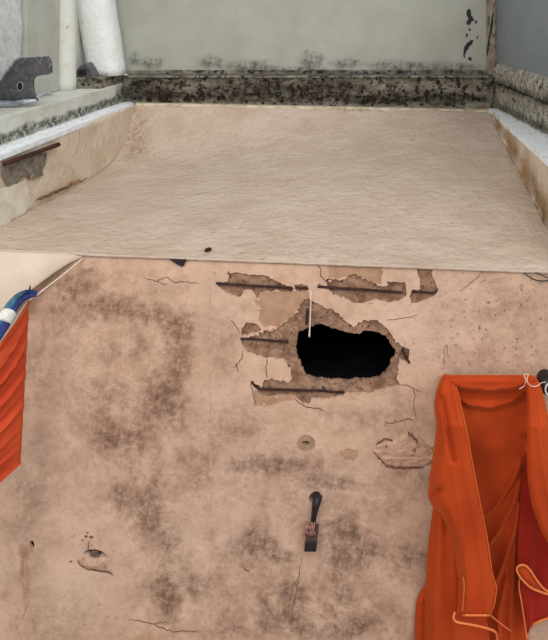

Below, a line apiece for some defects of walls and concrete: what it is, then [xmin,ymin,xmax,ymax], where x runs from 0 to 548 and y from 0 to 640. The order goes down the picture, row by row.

water stain [0,81,421,144]
crack [144,277,200,285]
spalling [317,266,438,305]
spalling [216,271,410,407]
crack [385,384,420,424]
crack [128,619,197,632]